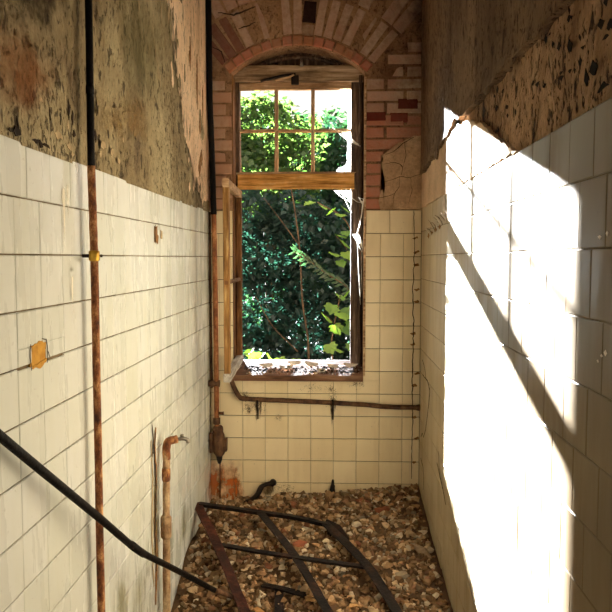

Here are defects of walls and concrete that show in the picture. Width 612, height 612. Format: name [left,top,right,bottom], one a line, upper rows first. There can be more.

flaking render [597,18,612,40]
flaking render [419,0,598,239]
crack [379,135,422,211]
peeling [28,338,50,371]
rust [209,468,242,500]